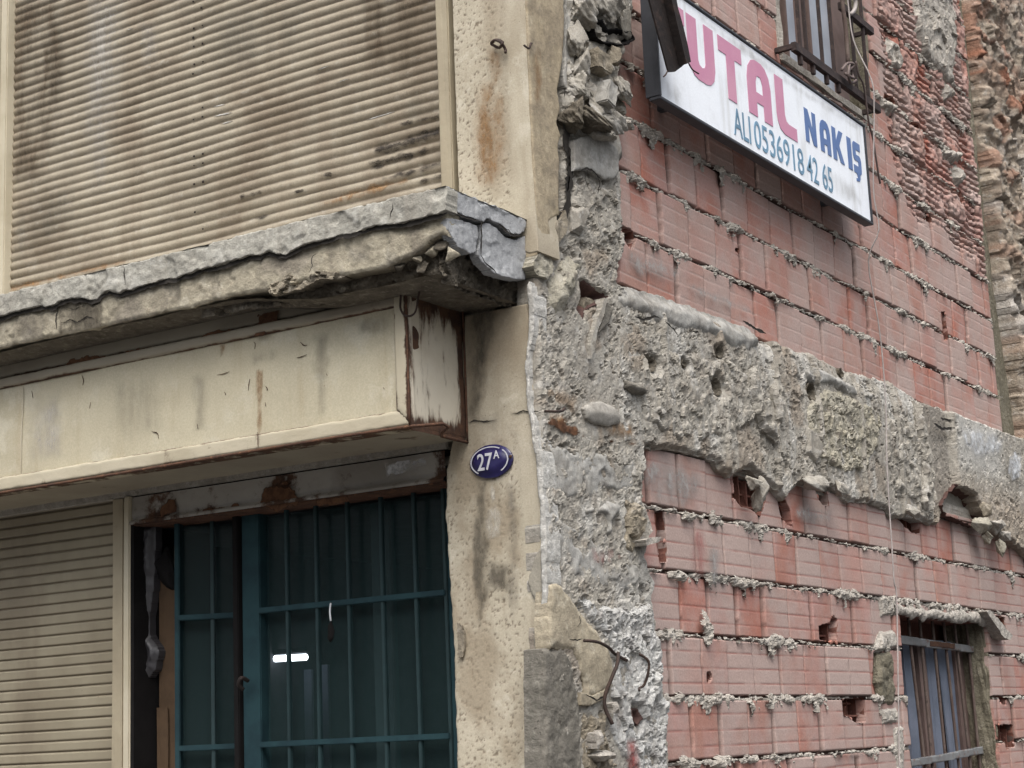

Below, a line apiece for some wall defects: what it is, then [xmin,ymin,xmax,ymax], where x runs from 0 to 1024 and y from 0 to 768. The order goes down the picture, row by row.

spalling [557,0,574,90]
spalling [555,185,634,250]
crack [0,205,521,329]
spalling [623,350,756,441]
spalling [804,389,929,500]
spalling [201,241,670,768]
damp [474,487,506,605]
spalling [730,476,793,526]
spalling [897,519,920,534]
spalling [938,484,992,528]
spalling [819,615,838,645]